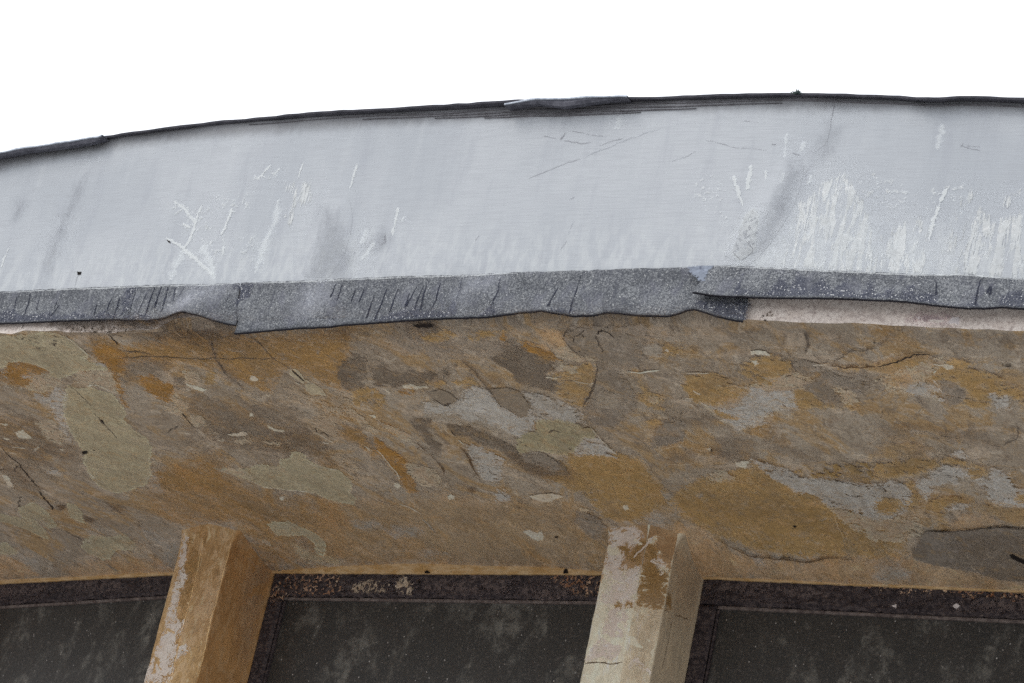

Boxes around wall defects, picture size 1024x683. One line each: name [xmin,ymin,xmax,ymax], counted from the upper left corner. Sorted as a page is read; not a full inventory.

water stain [166,194,248,275]
water stain [695,171,1024,325]
water stain [330,279,462,321]
crack [108,334,290,393]
crack [804,333,939,369]
crack [0,447,81,540]
peeling [0,321,1024,683]
crack [715,538,853,564]
crack [1009,554,1024,564]